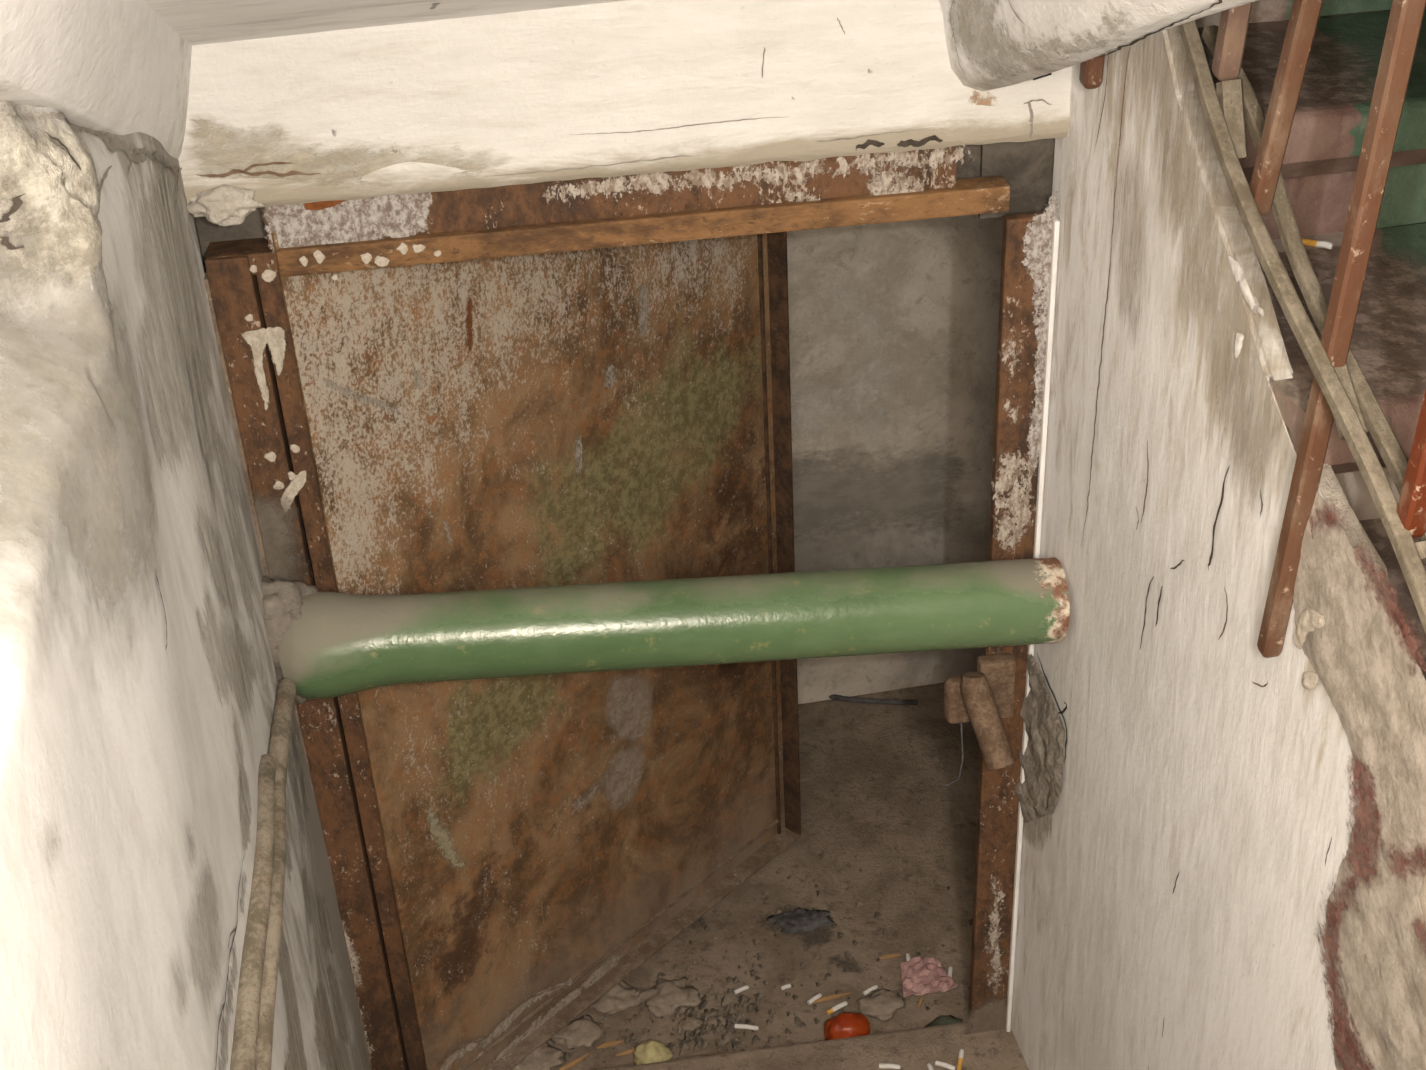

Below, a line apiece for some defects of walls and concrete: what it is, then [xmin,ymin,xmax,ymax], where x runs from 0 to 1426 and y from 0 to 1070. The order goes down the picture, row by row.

crack [0,111,320,214]
water stain [191,119,484,182]
peeling [542,145,976,208]
crack [85,263,120,430]
peeling [250,265,277,282]
peeling [242,314,286,410]
peeling [261,192,442,267]
corrosion [465,297,473,353]
peeling [990,191,1059,557]
crack [1023,0,1222,545]
water stain [0,166,258,788]
crack [215,846,246,1070]